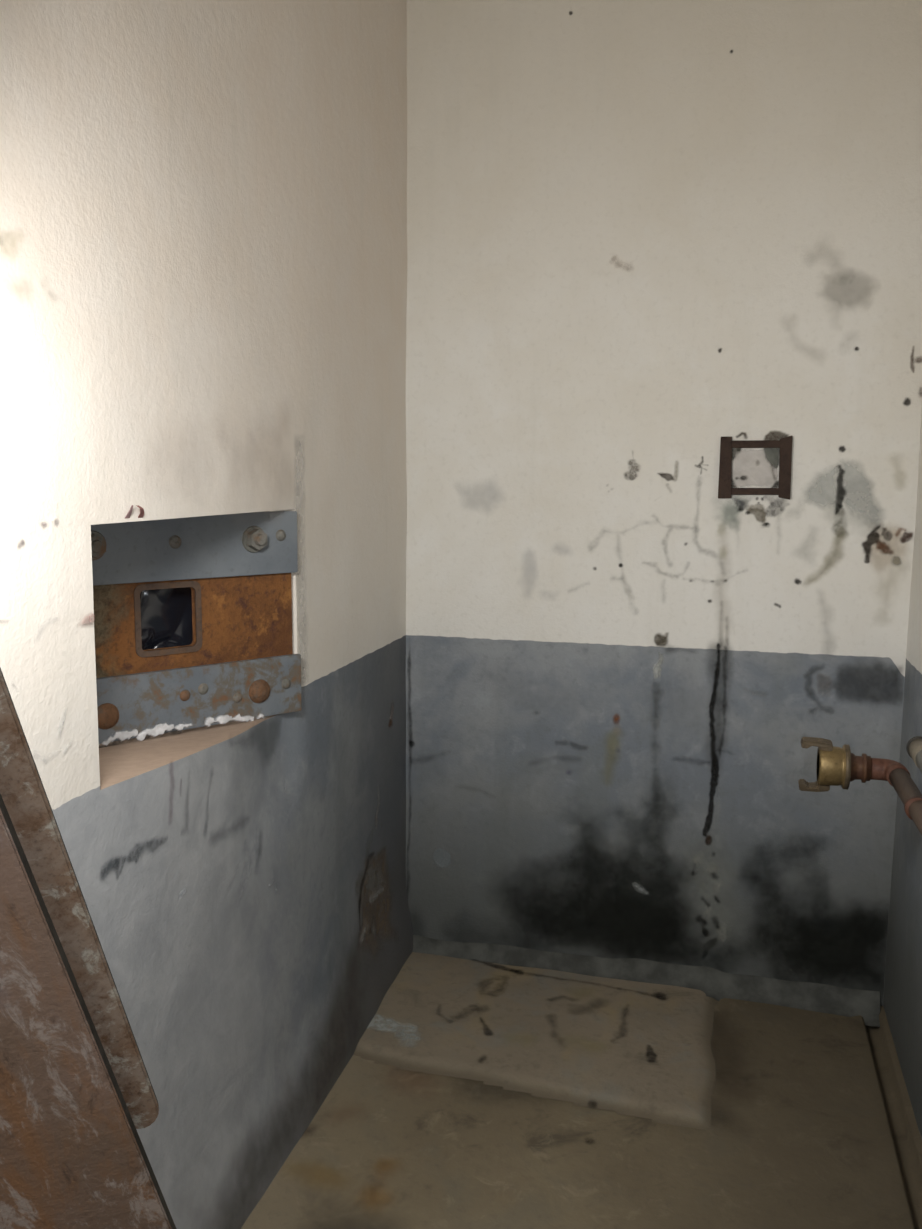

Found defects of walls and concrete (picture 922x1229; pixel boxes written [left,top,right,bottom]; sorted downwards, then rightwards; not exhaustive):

crack [836,466,846,538]
crack [703,644,726,845]
leakage [517,803,685,958]
leakage [757,884,885,983]